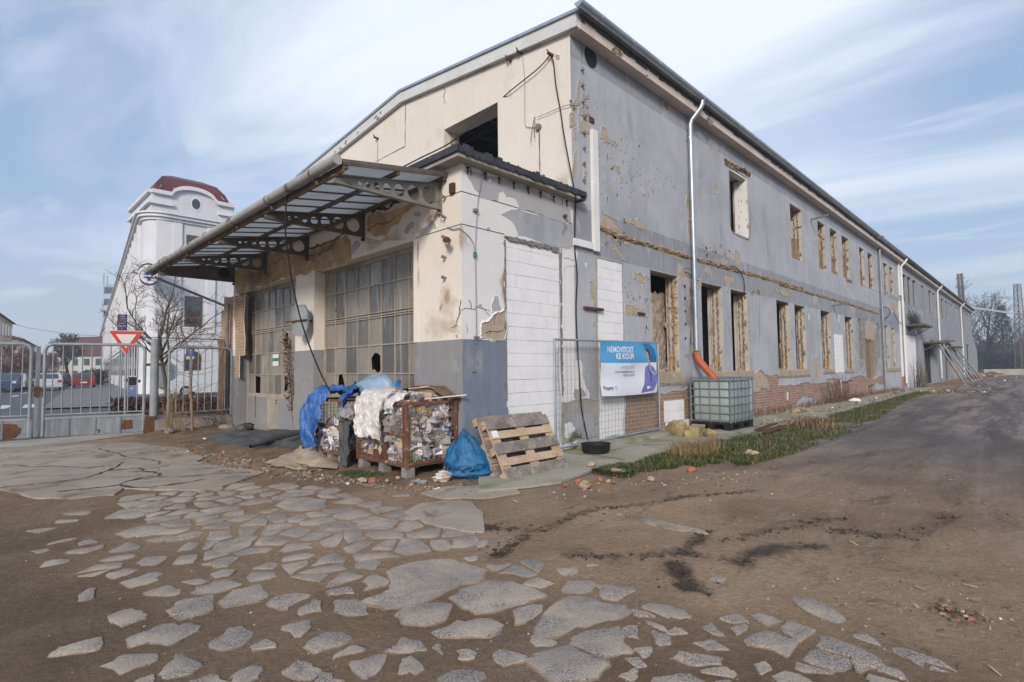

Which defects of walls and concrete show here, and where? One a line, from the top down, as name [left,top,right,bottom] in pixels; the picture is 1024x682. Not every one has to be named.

flaking render [234,235,361,379]
flaking render [366,203,443,238]
crack [451,300,502,333]
peeling [464,79,751,444]
spalling [579,15,973,311]
flaking render [741,353,924,415]